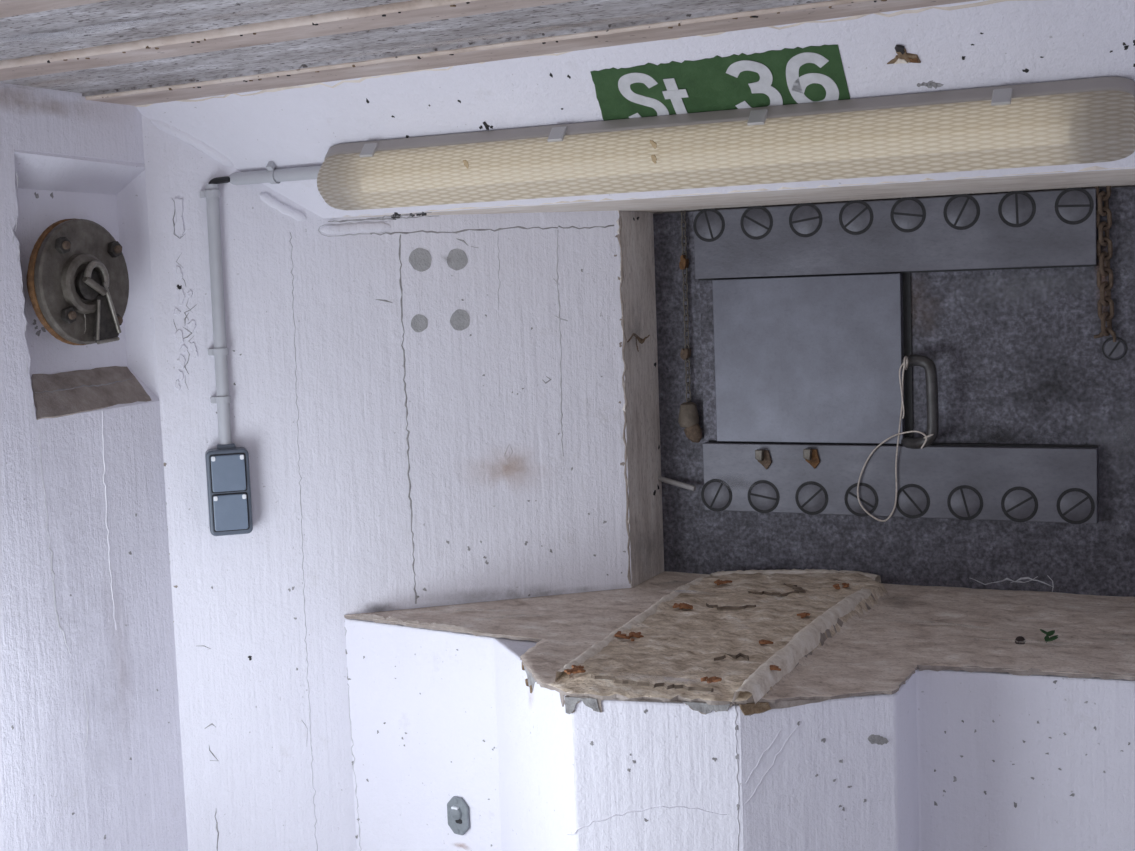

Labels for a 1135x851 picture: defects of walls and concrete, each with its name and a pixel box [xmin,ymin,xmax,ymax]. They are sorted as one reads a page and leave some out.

corrosion [614,631,644,641]
corrosion [564,665,586,674]
corrosion [700,676,722,684]
spalling [522,663,884,716]